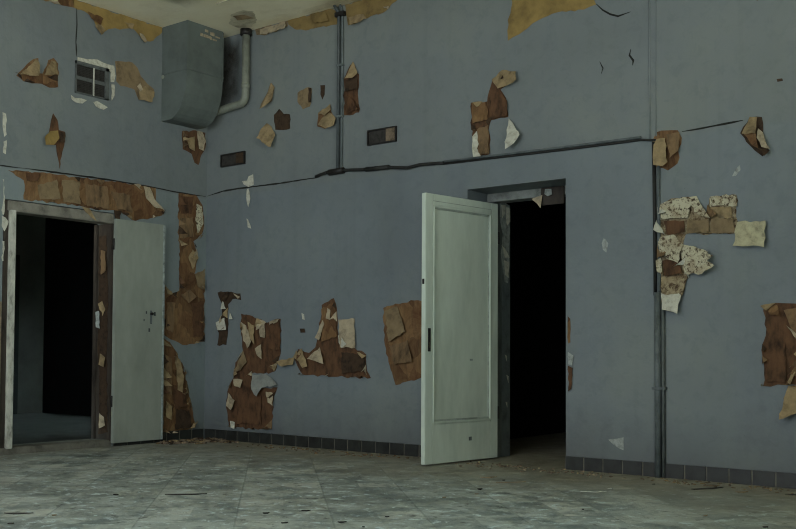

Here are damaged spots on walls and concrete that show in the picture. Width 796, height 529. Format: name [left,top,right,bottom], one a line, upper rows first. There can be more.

peeling [507,0,596,40]
crack [596,4,629,17]
peeling [9,114,166,221]
peeling [71,57,155,110]
peeling [297,62,360,129]
peeling [470,70,519,157]
peeling [740,117,770,156]
peeling [653,194,766,313]
peeling [163,193,205,434]
peeling [216,291,371,430]
peeling [383,300,422,385]
peeling [761,303,796,419]